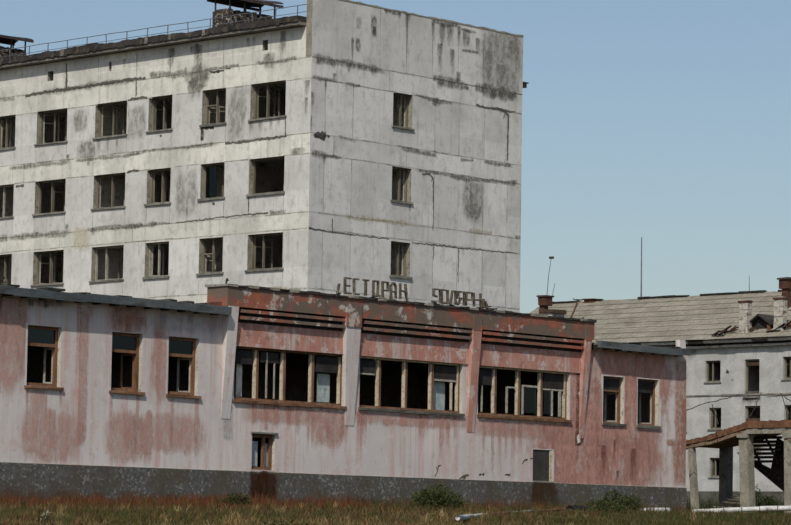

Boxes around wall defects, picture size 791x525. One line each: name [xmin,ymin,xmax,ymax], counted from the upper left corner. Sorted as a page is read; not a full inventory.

leakage [151,45,238,91]
leakage [432,20,503,72]
leakage [433,75,516,99]